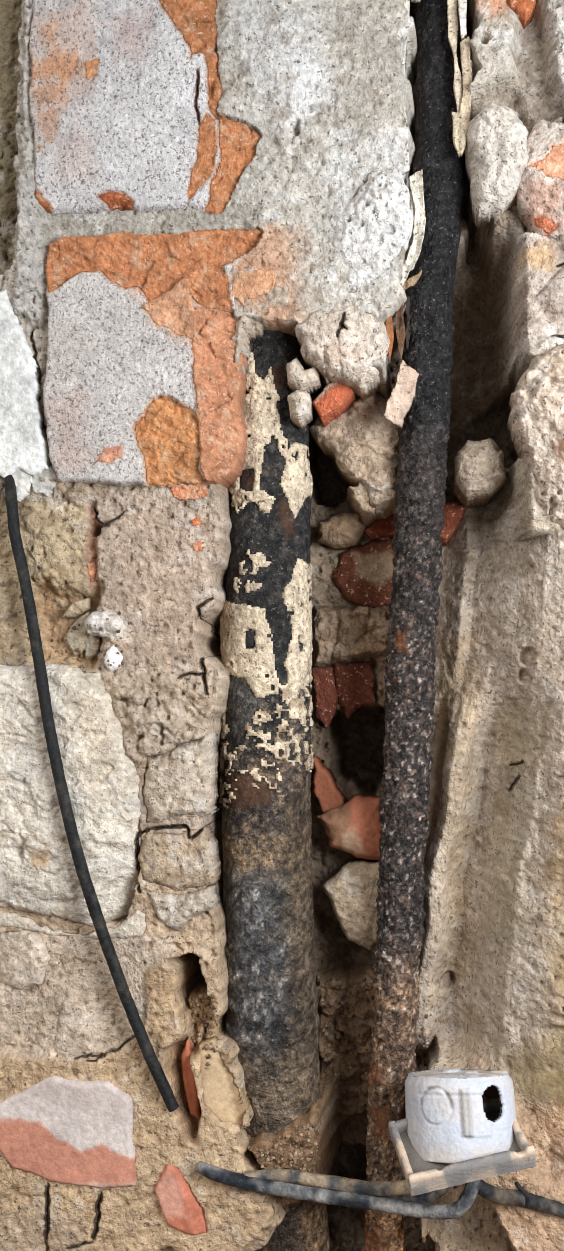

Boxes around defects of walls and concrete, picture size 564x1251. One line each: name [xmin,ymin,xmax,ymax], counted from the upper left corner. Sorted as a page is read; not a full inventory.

spalling [85,58,98,78]
spalling [160,0,262,214]
spalling [99,192,133,209]
spalling [46,229,313,518]
rust [272,370,285,387]
crack [178,597,221,695]
peeling [219,549,314,809]
rust [222,771,269,806]
crack [135,807,222,893]
crack [44,1185,102,1251]